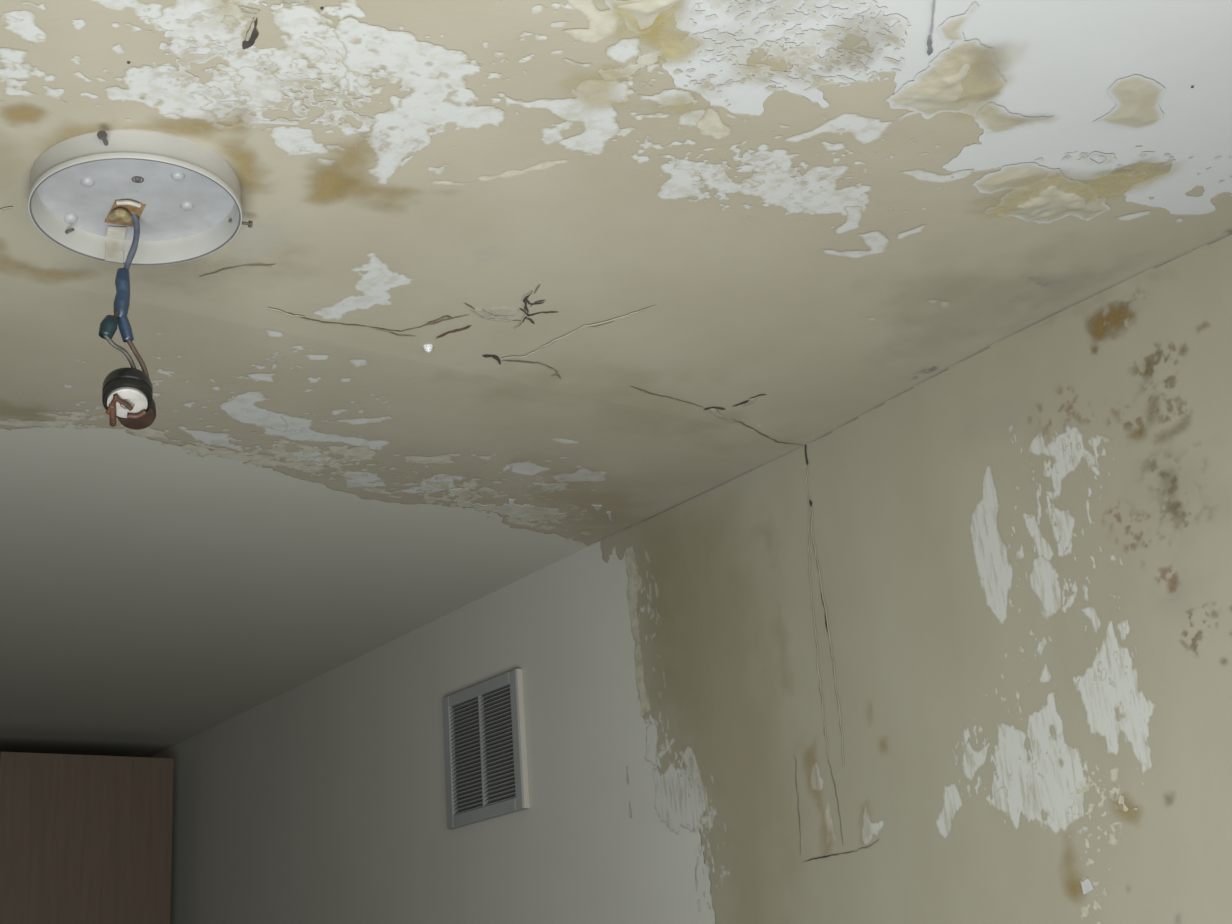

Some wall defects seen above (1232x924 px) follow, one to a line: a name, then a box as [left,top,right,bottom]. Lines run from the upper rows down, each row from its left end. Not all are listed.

crack [268,285,655,379]
peeling [0,0,1232,546]
crack [632,387,879,862]
peeling [600,234,1232,924]
leakage [1145,351,1173,388]